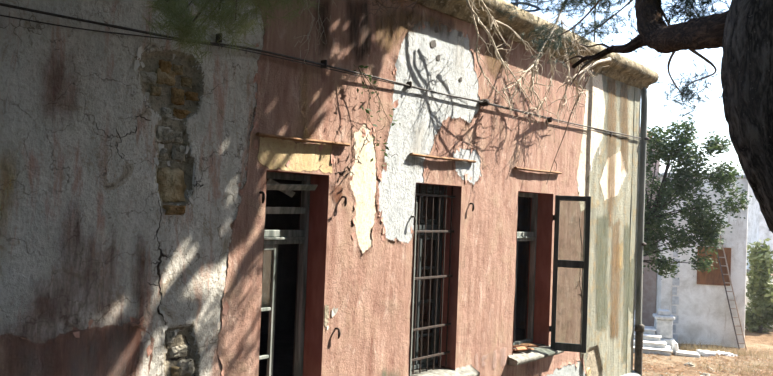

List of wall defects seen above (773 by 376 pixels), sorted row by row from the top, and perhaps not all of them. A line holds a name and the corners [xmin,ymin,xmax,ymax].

peeling [0,0,338,376]
crack [147,205,196,376]
peeling [345,16,483,263]
peeling [540,344,603,376]